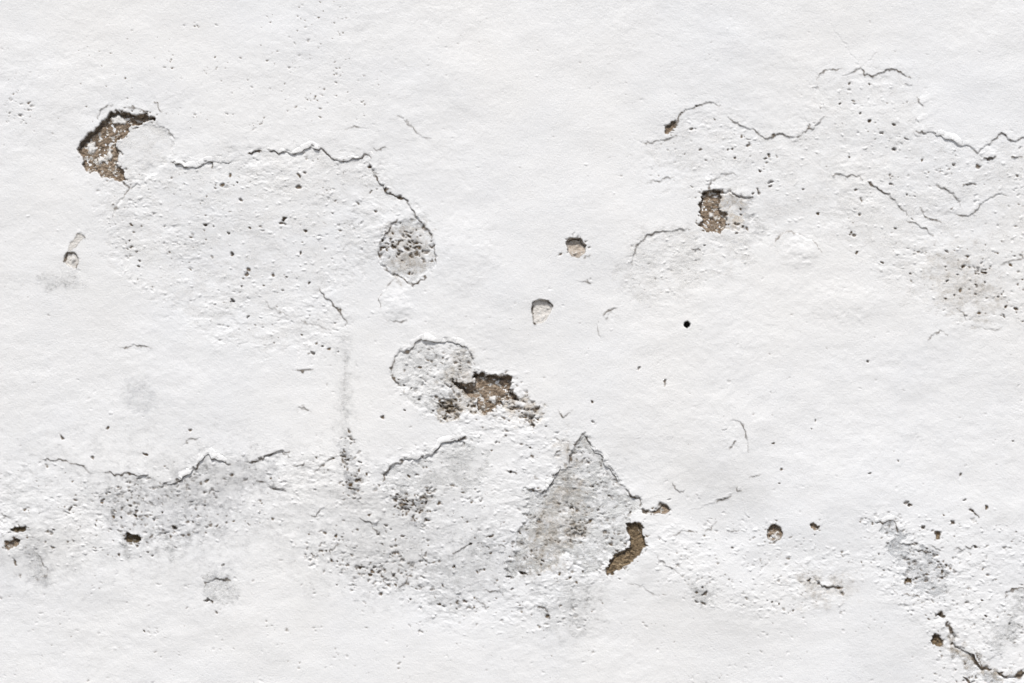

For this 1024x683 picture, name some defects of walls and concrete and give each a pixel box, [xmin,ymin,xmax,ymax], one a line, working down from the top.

spalling [77,111,156,181]
crack [918,129,1022,160]
crack [171,141,422,223]
spalling [698,190,742,237]
spalling [63,233,85,268]
spalling [566,238,586,258]
spalling [531,299,553,325]
spalling [452,372,542,418]
crack [167,448,303,490]
peeling [504,432,670,577]
spalling [767,524,783,540]
crack [935,611,1024,683]